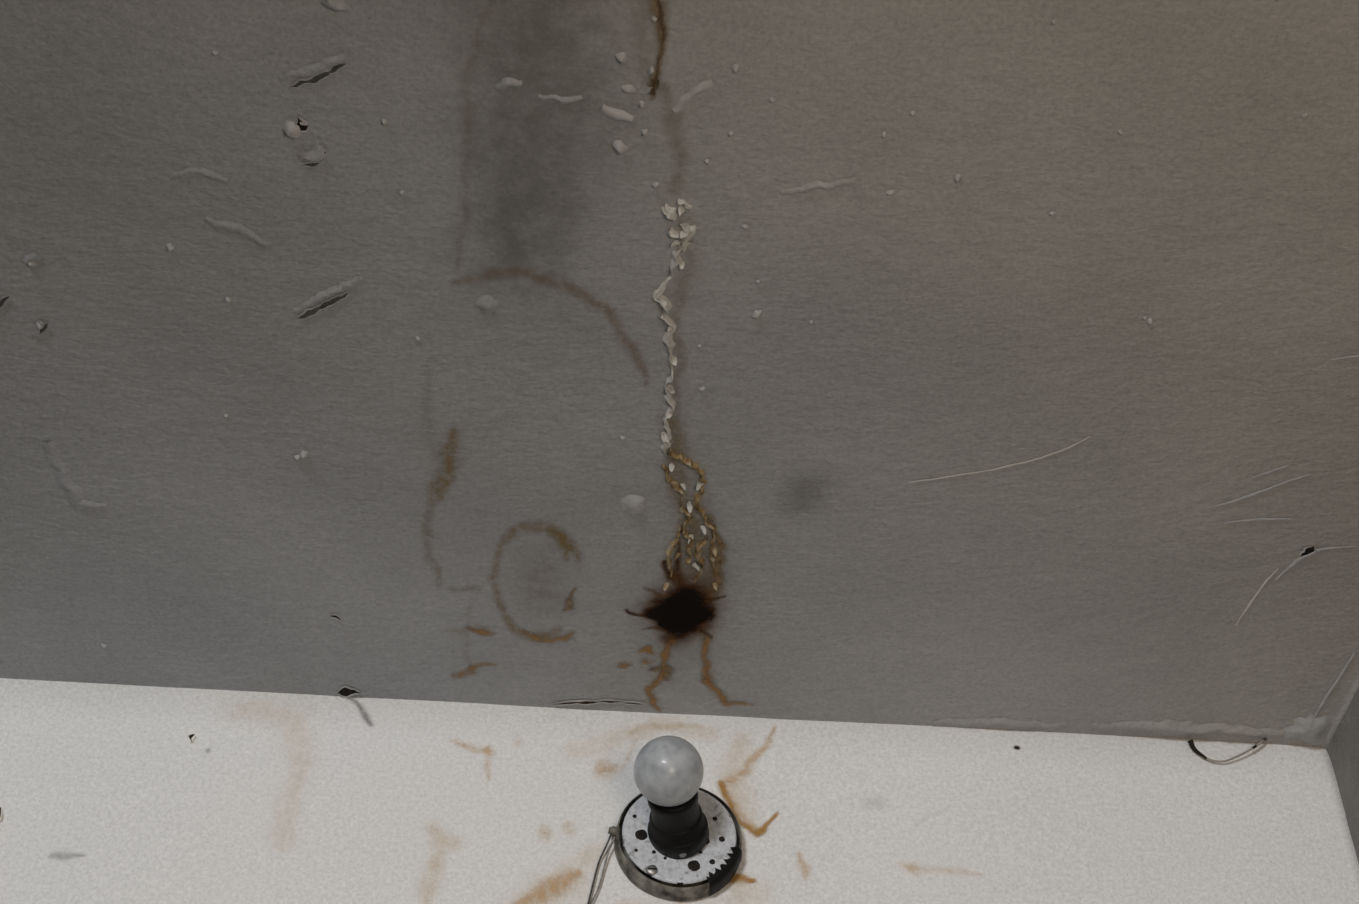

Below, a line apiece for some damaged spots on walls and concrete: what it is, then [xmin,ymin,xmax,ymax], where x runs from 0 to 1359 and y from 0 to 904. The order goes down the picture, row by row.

corrosion [617,517,751,711]
corrosion [718,748,778,836]
corrosion [729,874,755,883]